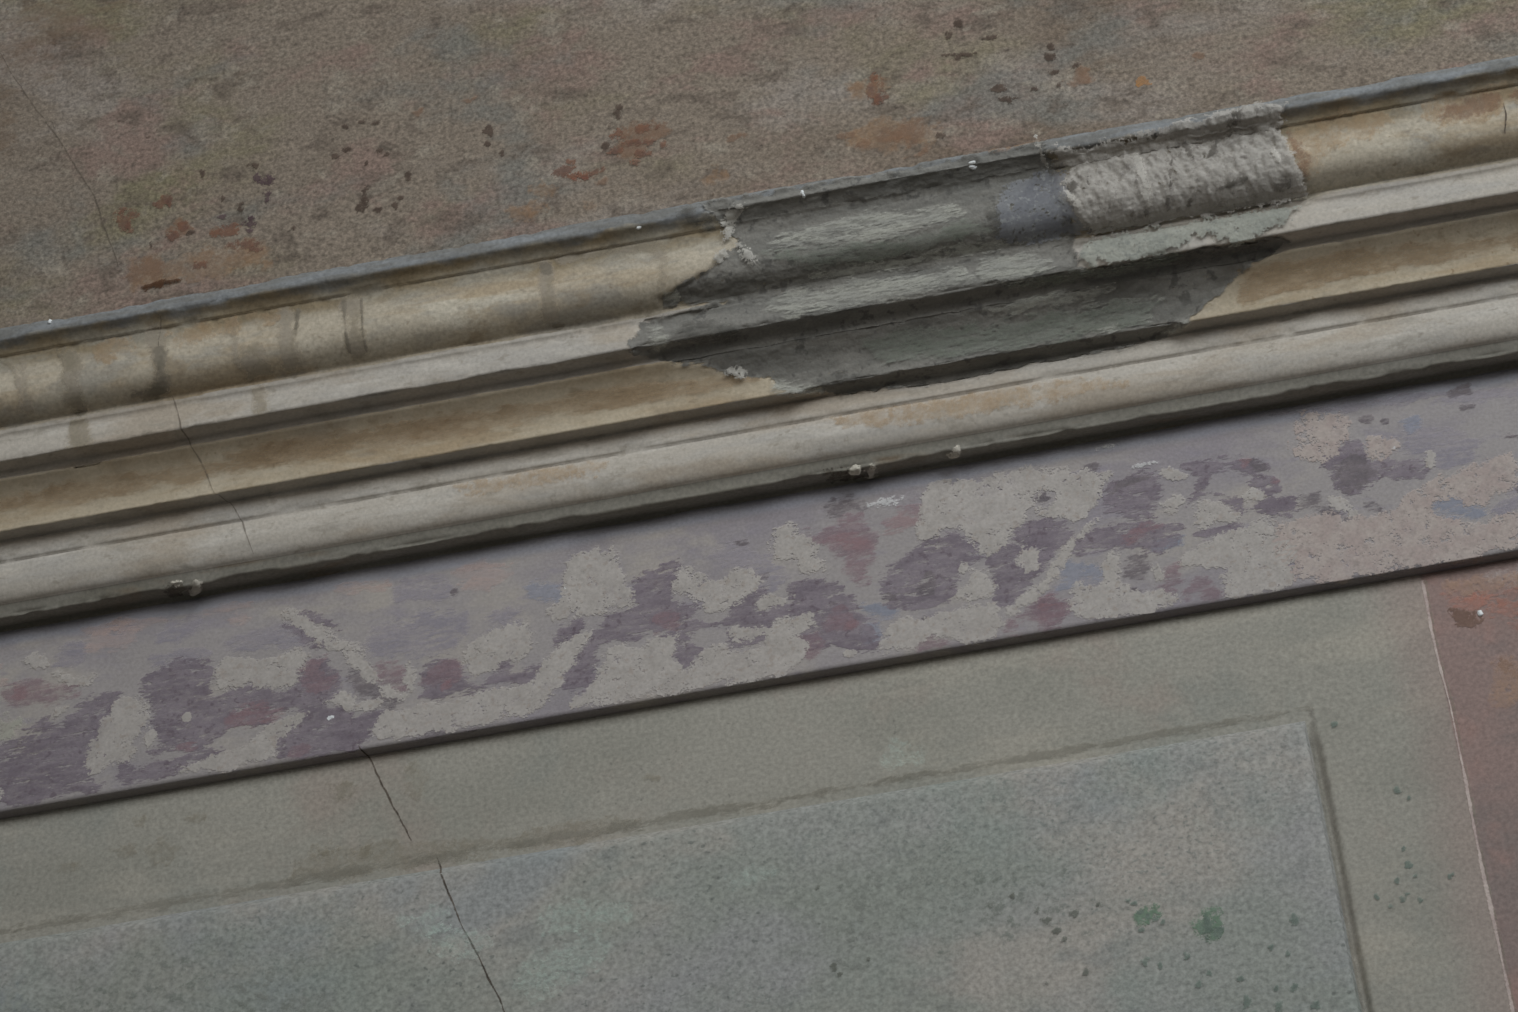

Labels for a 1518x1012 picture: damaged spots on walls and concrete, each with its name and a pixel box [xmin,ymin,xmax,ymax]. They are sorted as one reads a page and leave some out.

spalling [627,141,1291,398]
peeling [0,382,1518,807]
crack [359,746,505,1012]